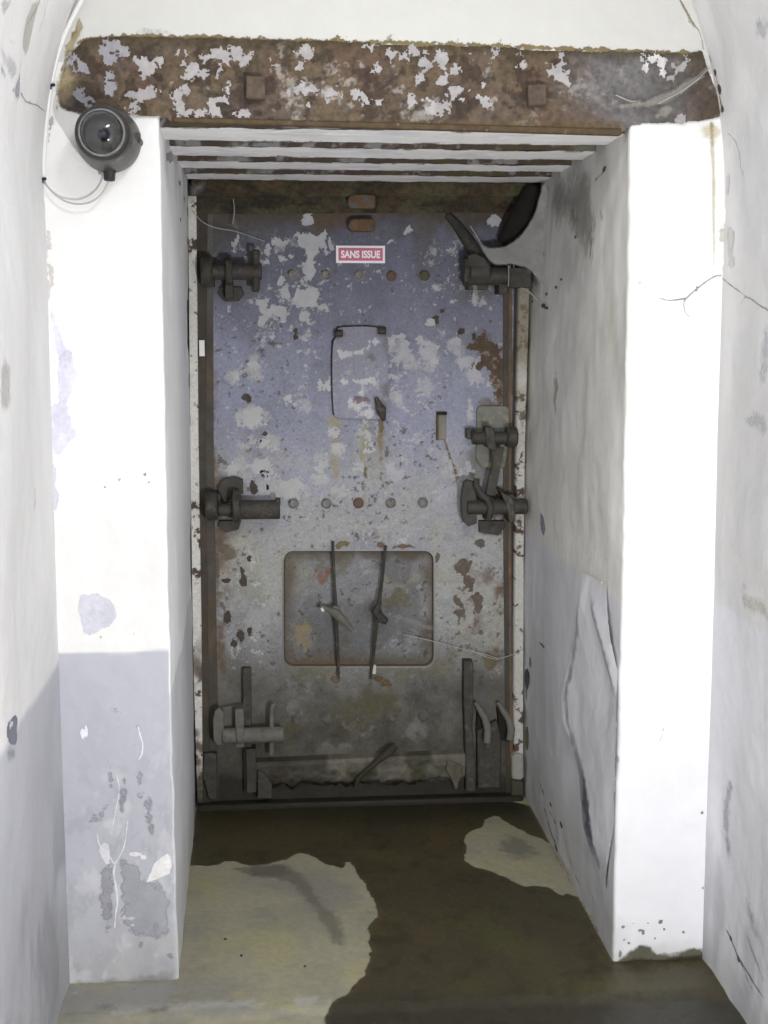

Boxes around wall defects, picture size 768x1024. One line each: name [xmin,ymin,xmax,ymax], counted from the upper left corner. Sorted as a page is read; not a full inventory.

peeling [65,52,90,74]
peeling [72,36,254,118]
peeling [286,43,384,108]
peeling [361,34,493,117]
peeling [545,51,572,87]
peeling [639,51,691,82]
crack [661,275,768,311]
flaking render [78,593,117,638]
peeling [108,773,143,812]
leakage [582,780,592,840]
peeling [99,843,172,944]
leakage [191,801,747,1024]